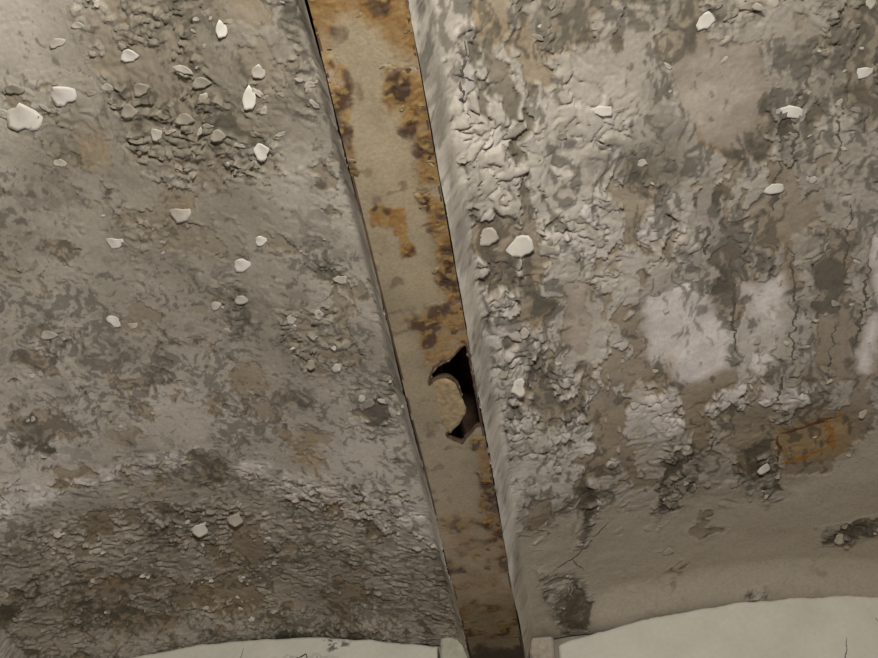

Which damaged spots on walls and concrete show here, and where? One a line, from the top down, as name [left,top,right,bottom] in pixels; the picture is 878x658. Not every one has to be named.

peeling [506,0,598,63]
spalling [634,0,878,399]
peeling [463,171,711,538]
damp [0,415,443,558]
damp [329,373,413,440]
spalling [572,480,604,551]
peeling [727,428,797,511]
rust [768,410,861,468]
peeling [812,514,878,549]
damp [0,603,52,658]
crack [240,648,341,658]
damp [264,620,453,654]